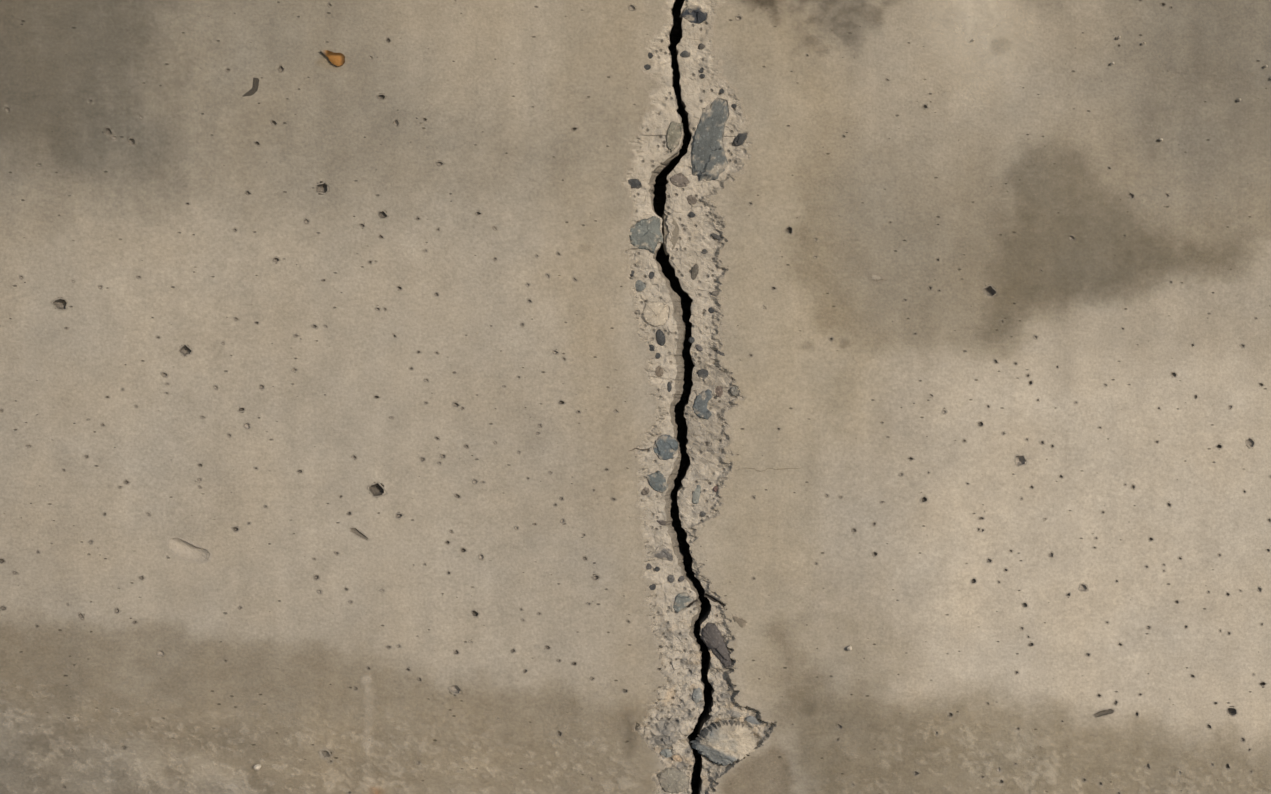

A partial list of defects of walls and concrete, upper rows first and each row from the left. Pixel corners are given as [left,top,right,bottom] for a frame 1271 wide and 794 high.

crack [630,0,727,794]
spalling [619,0,779,794]